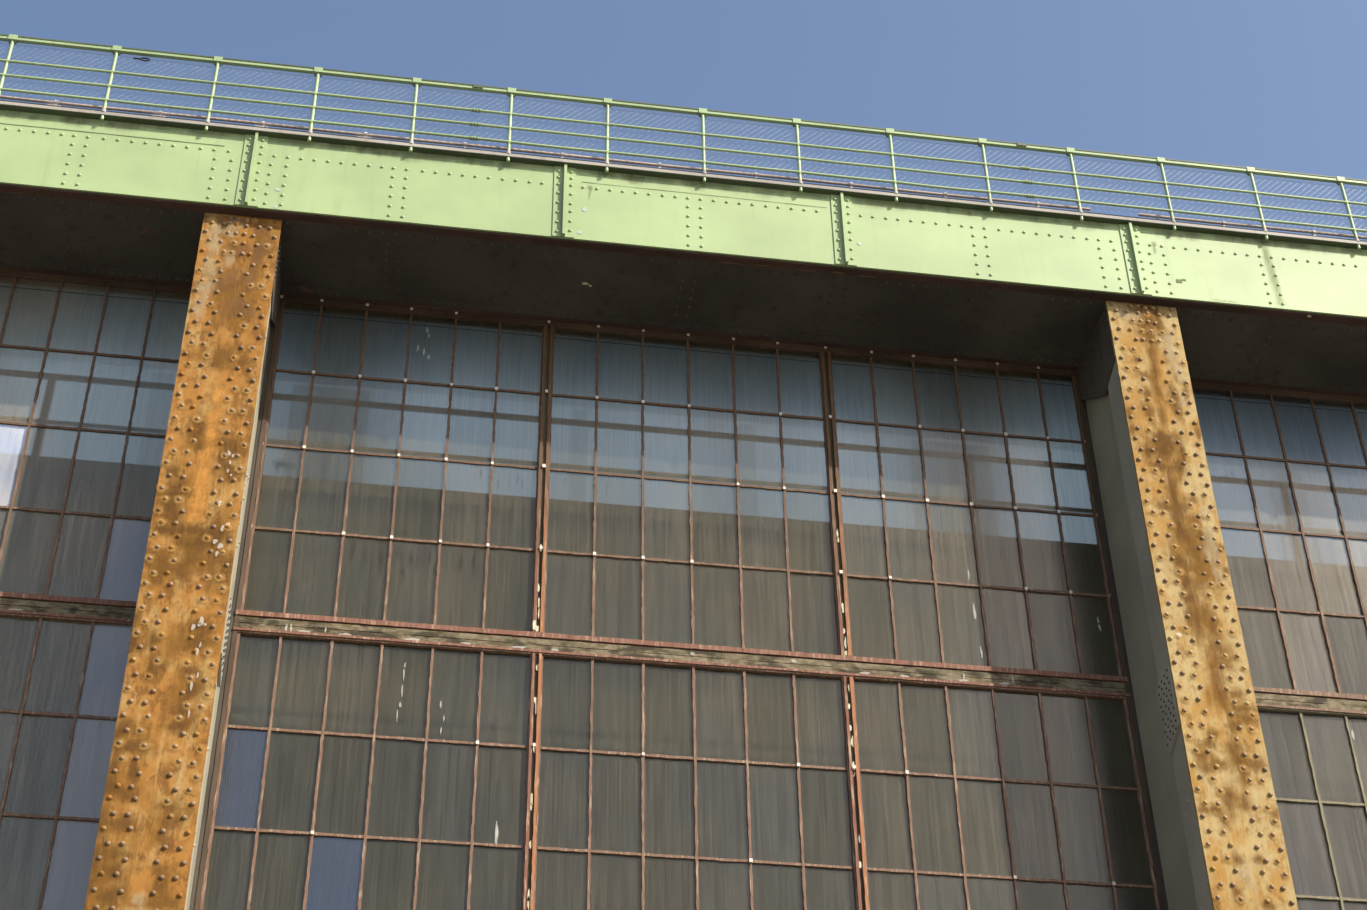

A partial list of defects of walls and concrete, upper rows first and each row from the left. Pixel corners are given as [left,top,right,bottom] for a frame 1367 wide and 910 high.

corrosion [160,389,240,575]
corrosion [1146,432,1208,600]